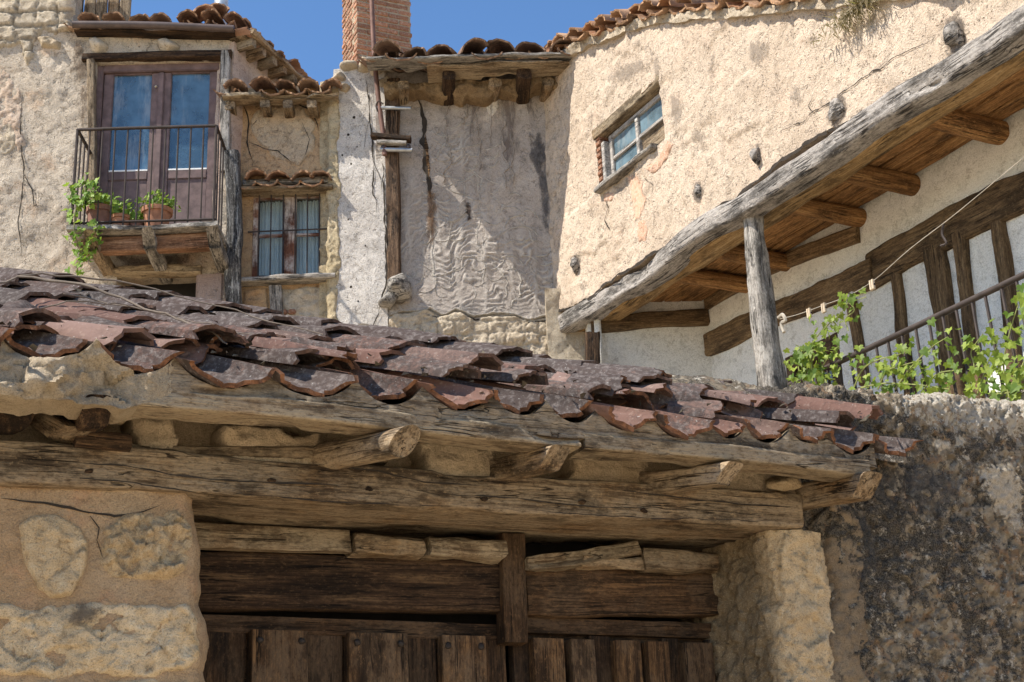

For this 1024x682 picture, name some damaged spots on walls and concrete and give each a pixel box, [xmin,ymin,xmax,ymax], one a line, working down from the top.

crack [18,93,35,256]
crack [244,107,310,161]
crack [418,100,432,198]
leakage [529,133,549,228]
flaking render [628,141,673,242]
leakage [932,435,967,454]
crack [1,498,162,555]
leakage [978,460,1024,537]